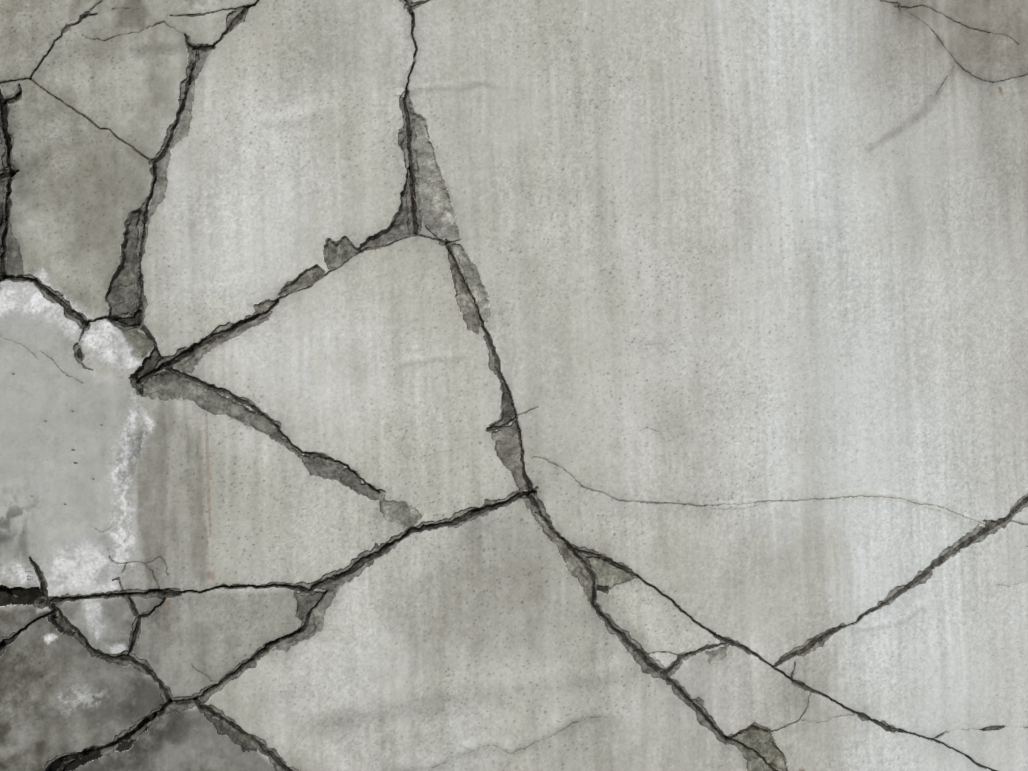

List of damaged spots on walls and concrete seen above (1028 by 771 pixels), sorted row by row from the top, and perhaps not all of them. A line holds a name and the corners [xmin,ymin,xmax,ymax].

crack [880,0,1028,94]
flaking render [0,179,24,276]
crack [0,0,538,493]
flaking render [246,99,491,335]
water stain [0,269,141,370]
water stain [2,398,154,638]
crack [533,456,811,510]
flaking render [0,585,40,606]
crack [0,486,1028,771]